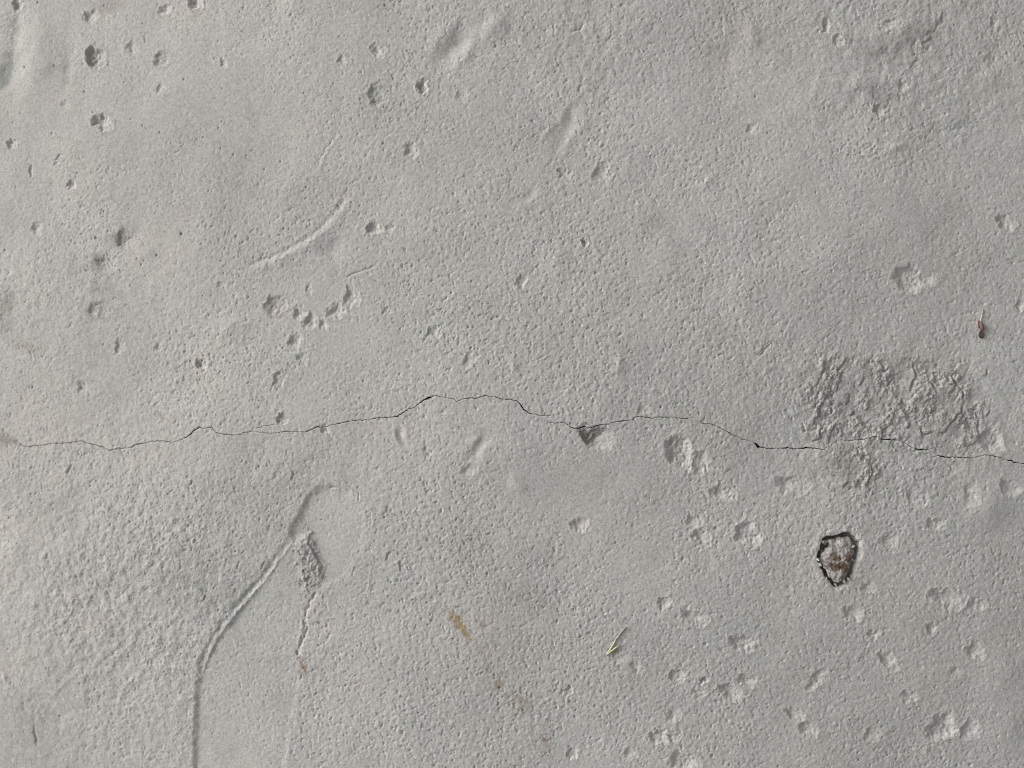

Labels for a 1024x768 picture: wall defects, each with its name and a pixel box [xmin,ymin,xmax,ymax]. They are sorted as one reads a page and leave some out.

crack [15,392,1024,467]
rust [828,555,852,575]